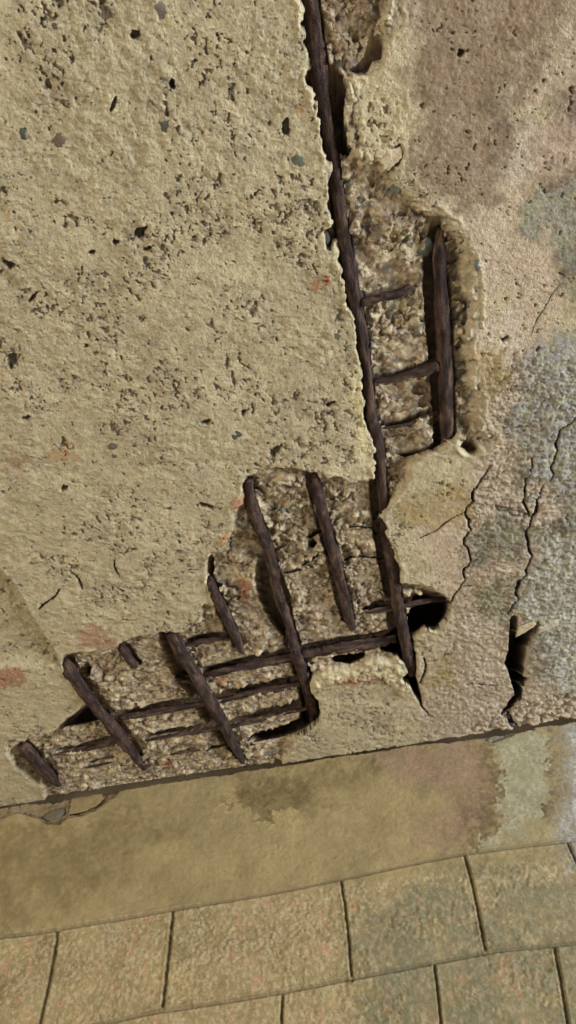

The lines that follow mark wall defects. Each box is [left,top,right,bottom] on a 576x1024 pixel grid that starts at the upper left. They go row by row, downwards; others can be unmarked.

spalling [0,0,512,825]
crack [420,465,490,604]
crack [508,422,572,612]
water stain [377,725,576,864]